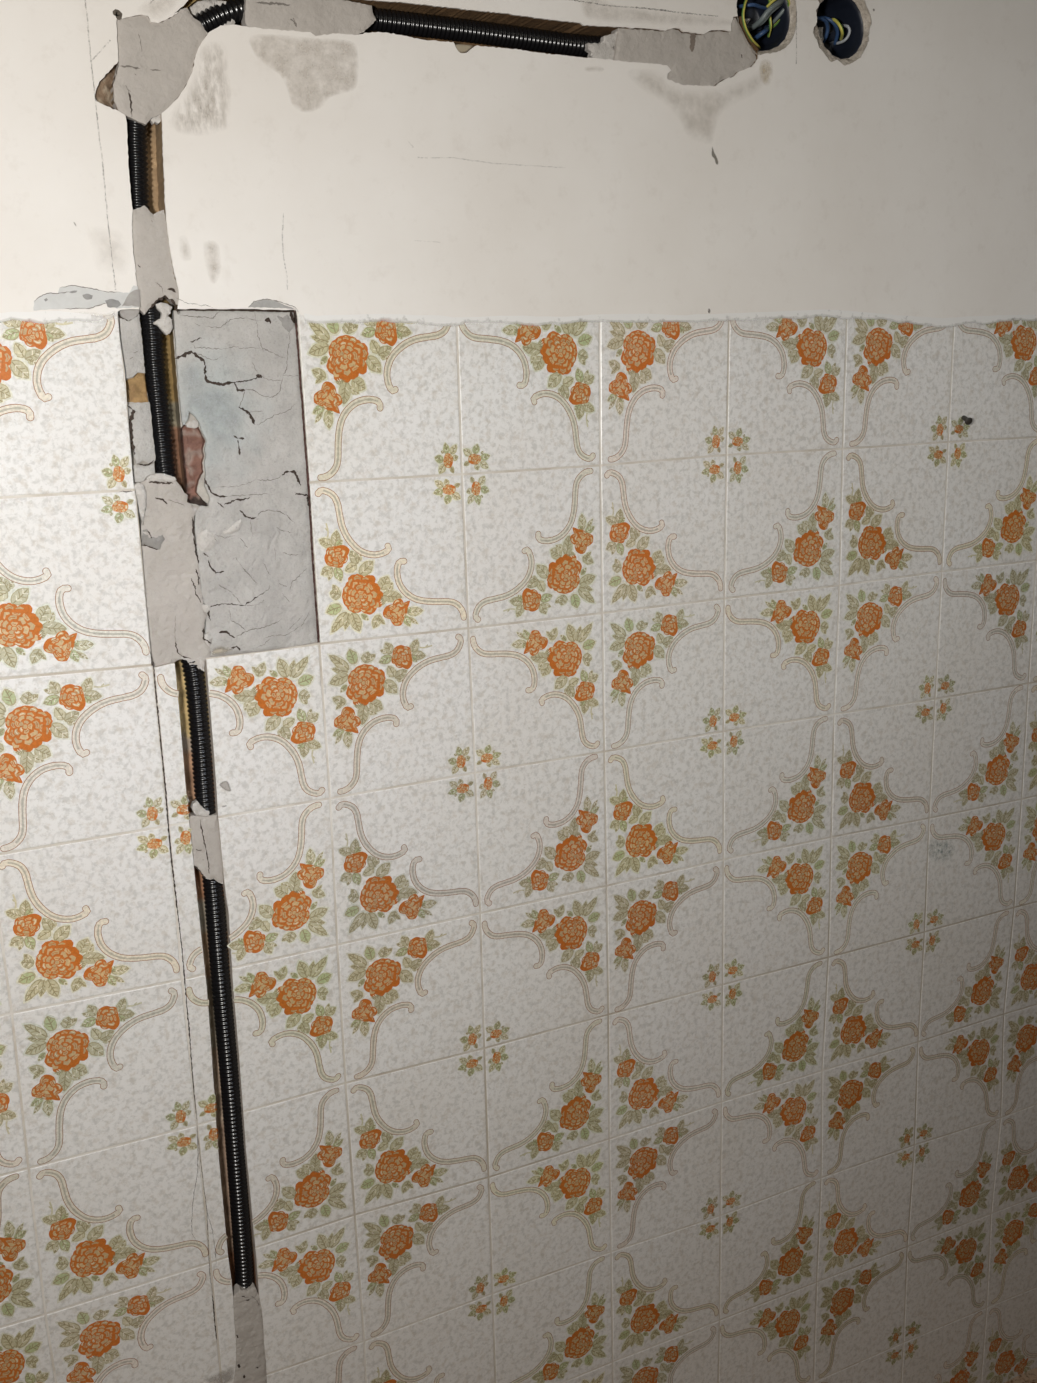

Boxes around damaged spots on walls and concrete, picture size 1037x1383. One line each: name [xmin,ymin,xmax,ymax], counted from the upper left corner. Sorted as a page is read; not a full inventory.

spalling [95,63,118,109]
peeling [249,299,296,332]
spalling [125,373,148,403]
spalling [179,425,208,506]
spalling [141,529,165,549]
crack [118,282,309,1339]